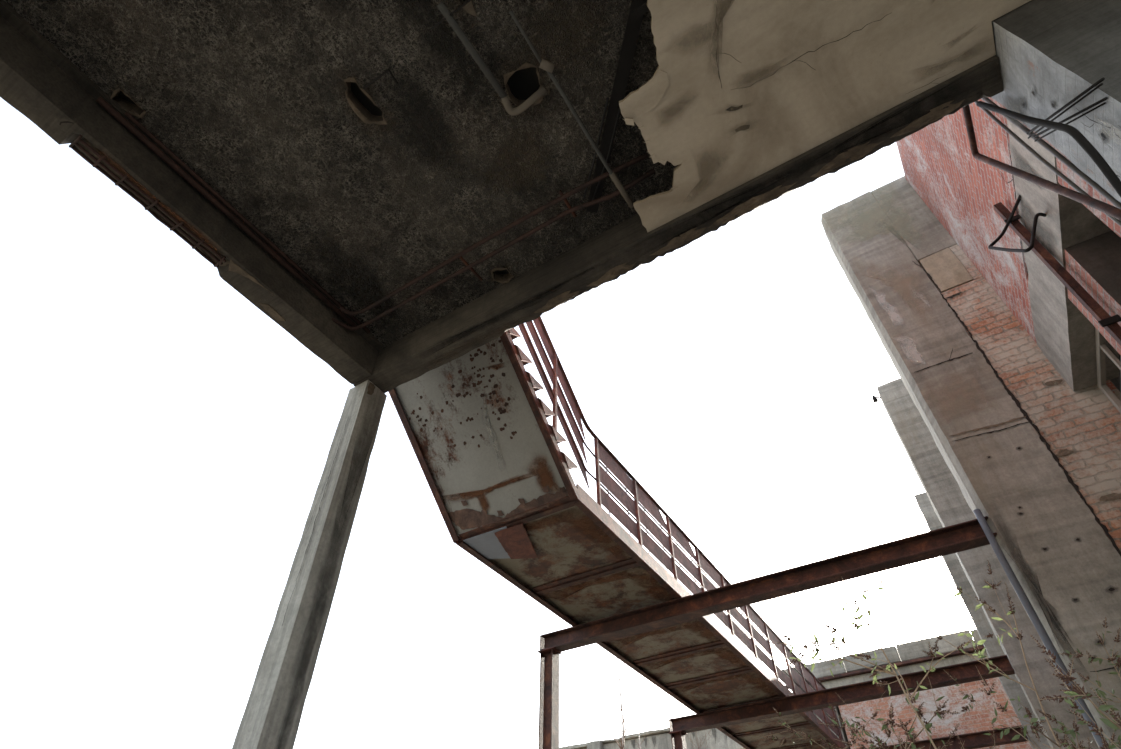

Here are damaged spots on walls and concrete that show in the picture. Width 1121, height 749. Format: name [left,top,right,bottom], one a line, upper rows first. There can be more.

crack [715,7,888,90]
spalling [344,78,387,125]
flaking render [619,70,669,165]
spalling [811,99,965,177]
spalling [649,182,797,256]
corrosion [409,340,517,448]
corrosion [448,458,623,557]
corrosion [620,622,776,695]